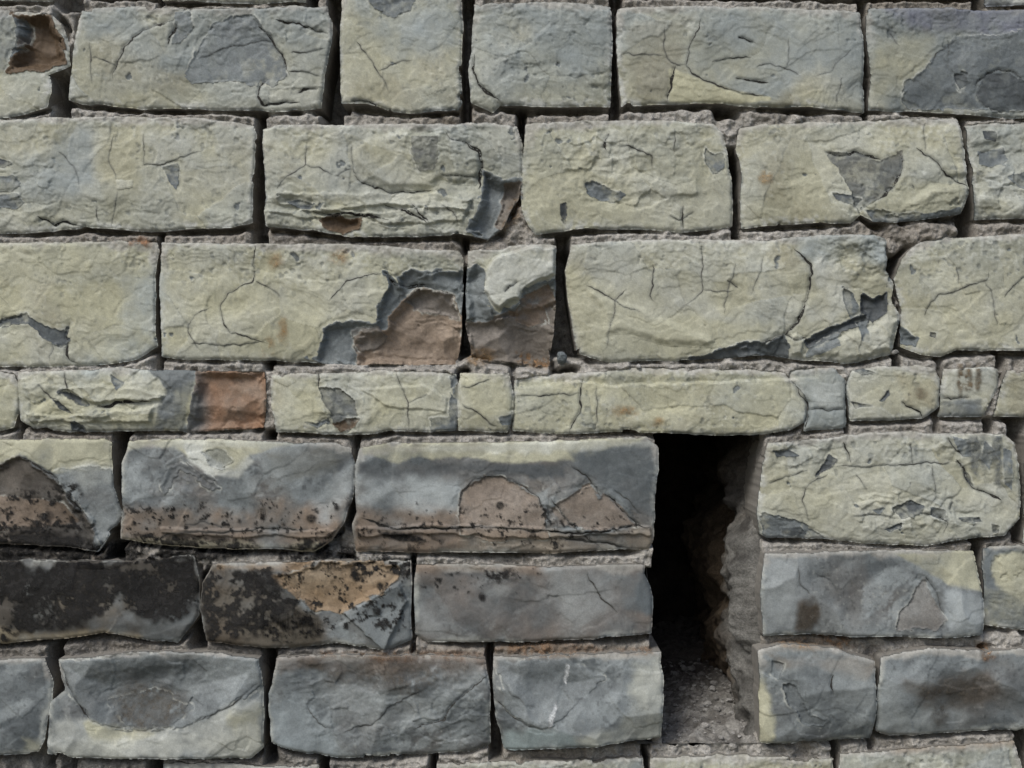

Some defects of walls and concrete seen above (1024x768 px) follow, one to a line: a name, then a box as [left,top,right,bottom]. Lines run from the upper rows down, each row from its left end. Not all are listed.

spalling [5,11,67,74]
crack [90,19,177,78]
crack [200,19,326,106]
crack [38,135,118,226]
crack [277,136,483,223]
spalling [304,245,567,432]
crack [589,267,654,344]
crack [760,249,813,344]
spalling [187,371,266,432]
spalling [0,455,124,551]
spalling [458,475,637,542]
crack [771,437,1001,529]